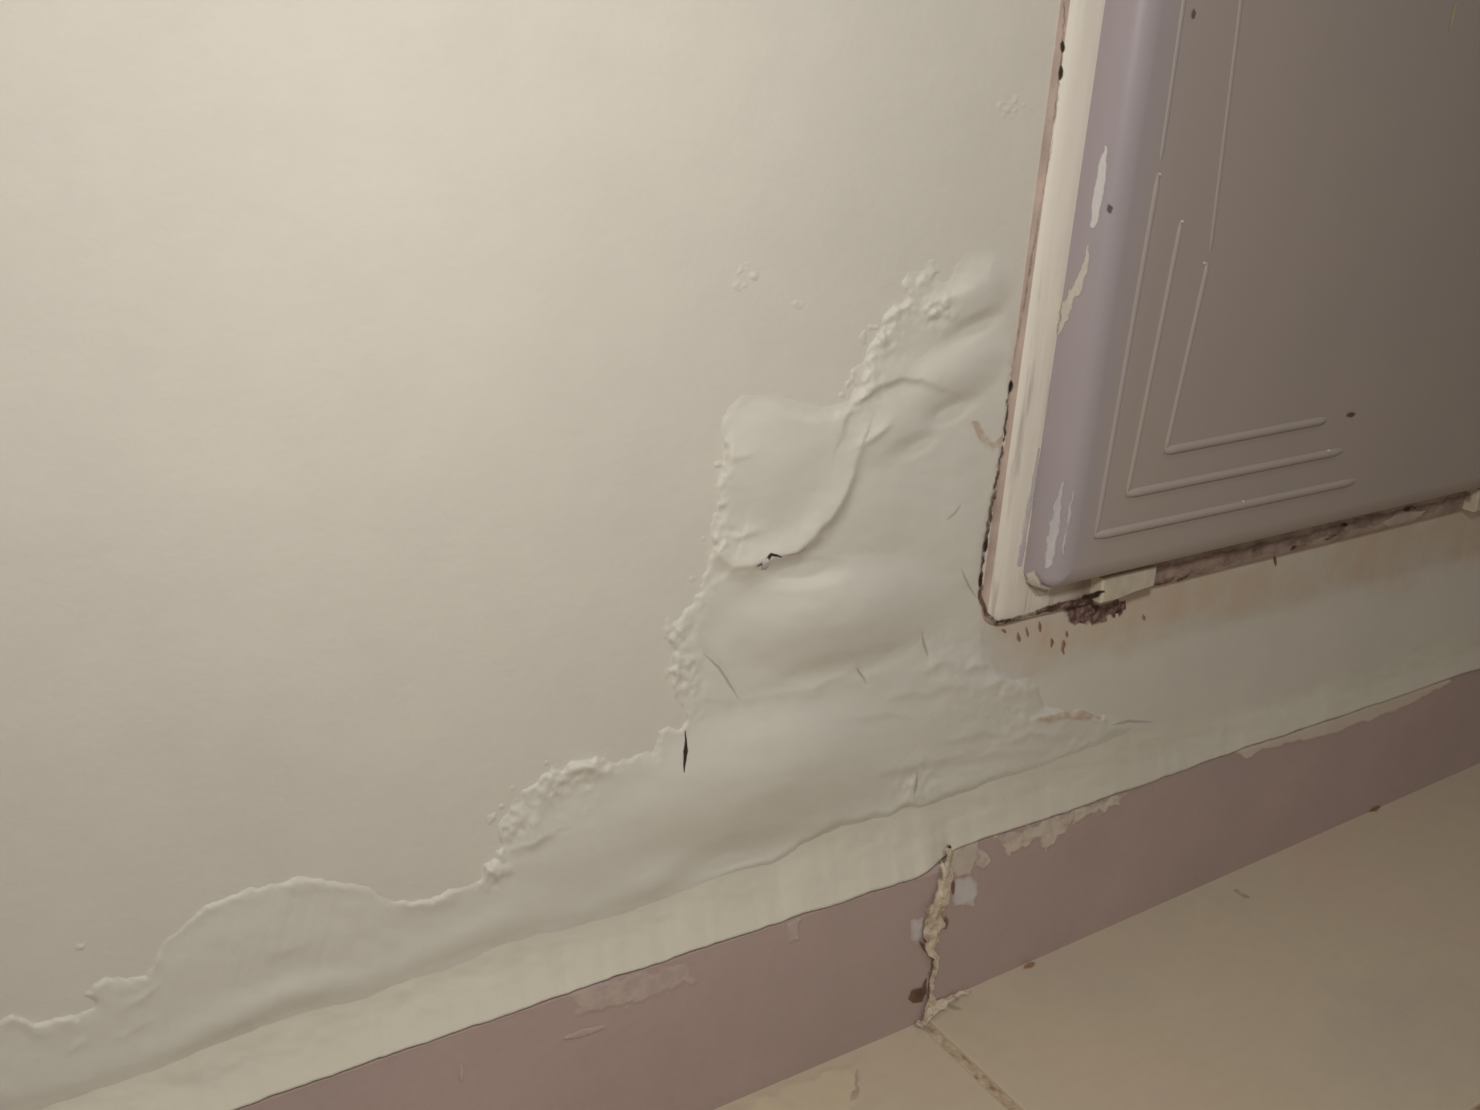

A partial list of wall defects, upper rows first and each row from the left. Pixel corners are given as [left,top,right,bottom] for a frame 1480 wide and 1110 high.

peeling [479,216,1134,955]
crack [681,731,689,772]
peeling [1234,678,1453,760]
crack [916,845,955,1027]